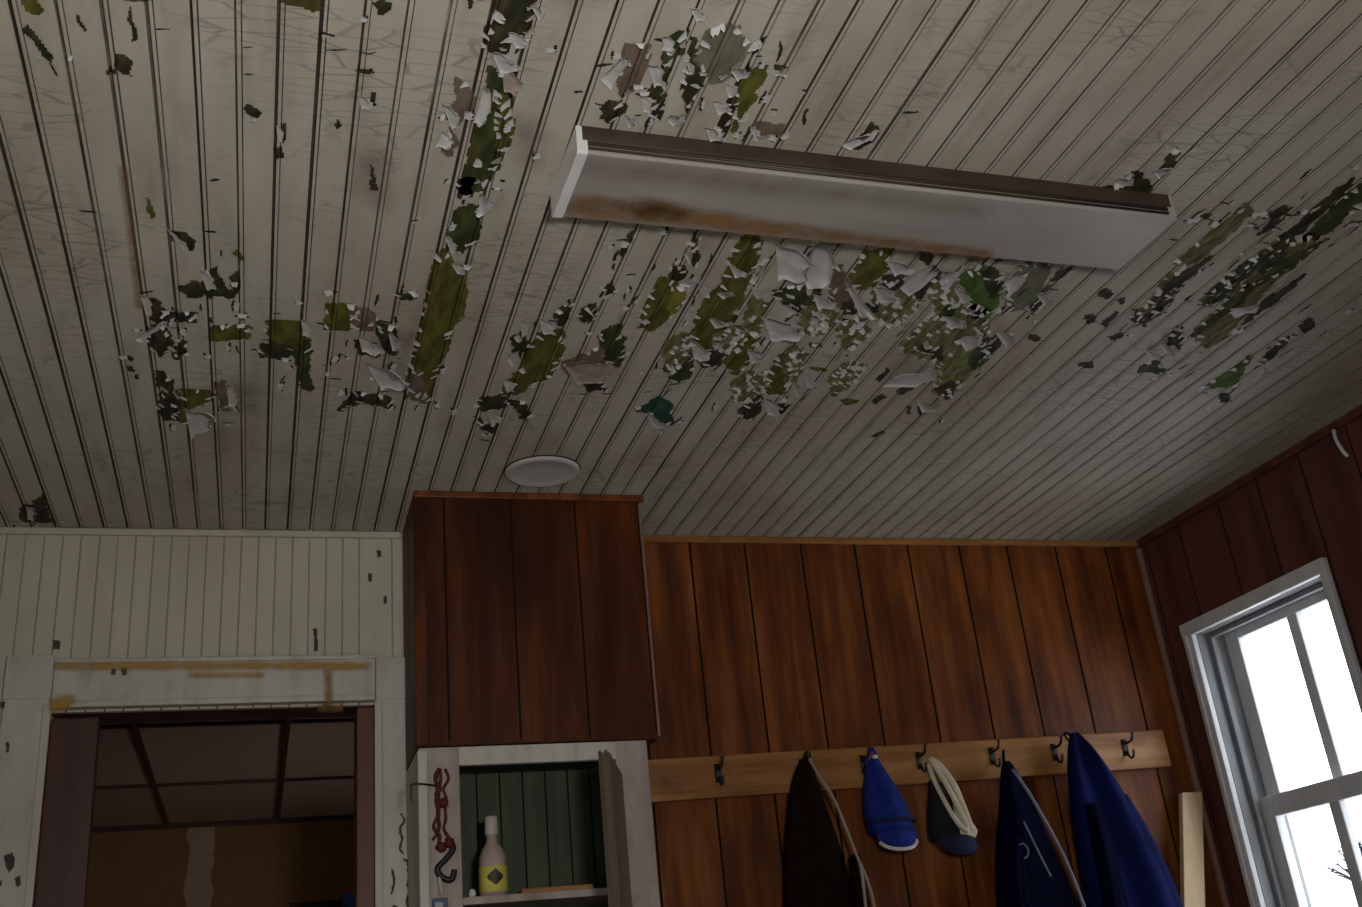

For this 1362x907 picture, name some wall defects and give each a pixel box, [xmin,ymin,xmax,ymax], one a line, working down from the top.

peeling [21,0,73,76]
peeling [106,6,138,77]
peeling [117,0,1073,441]
peeling [1083,164,1362,411]